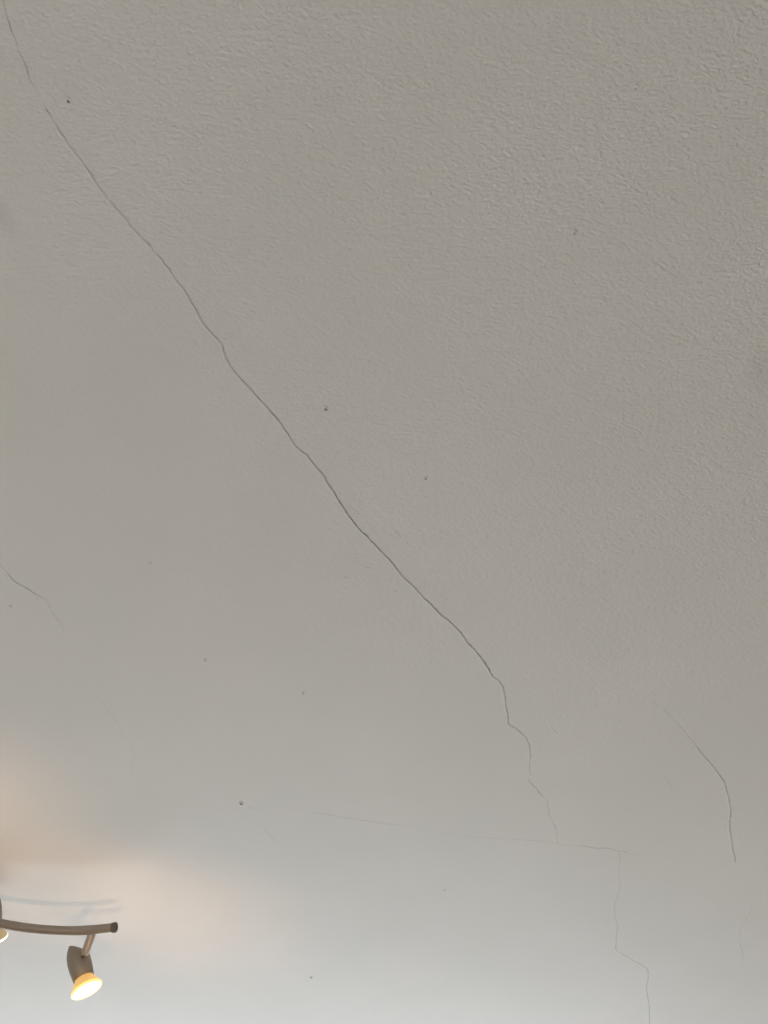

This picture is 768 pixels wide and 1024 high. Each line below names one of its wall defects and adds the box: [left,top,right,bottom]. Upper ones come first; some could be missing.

crack [45,111,560,804]